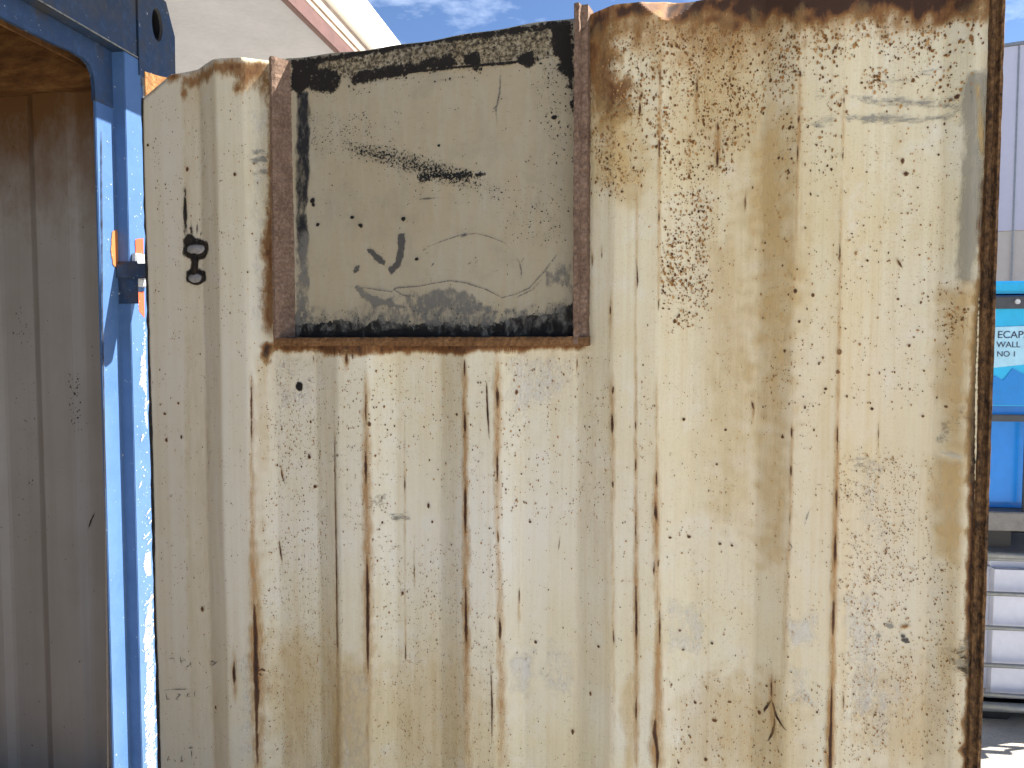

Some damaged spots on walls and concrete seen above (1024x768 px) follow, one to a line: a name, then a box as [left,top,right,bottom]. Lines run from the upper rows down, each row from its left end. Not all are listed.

leakage [549,21,575,112]
leakage [290,51,573,337]
peeling [139,322,149,441]
rust [155,58,622,768]
rust [590,0,990,768]
peeling [144,508,152,576]
peeling [143,595,157,768]